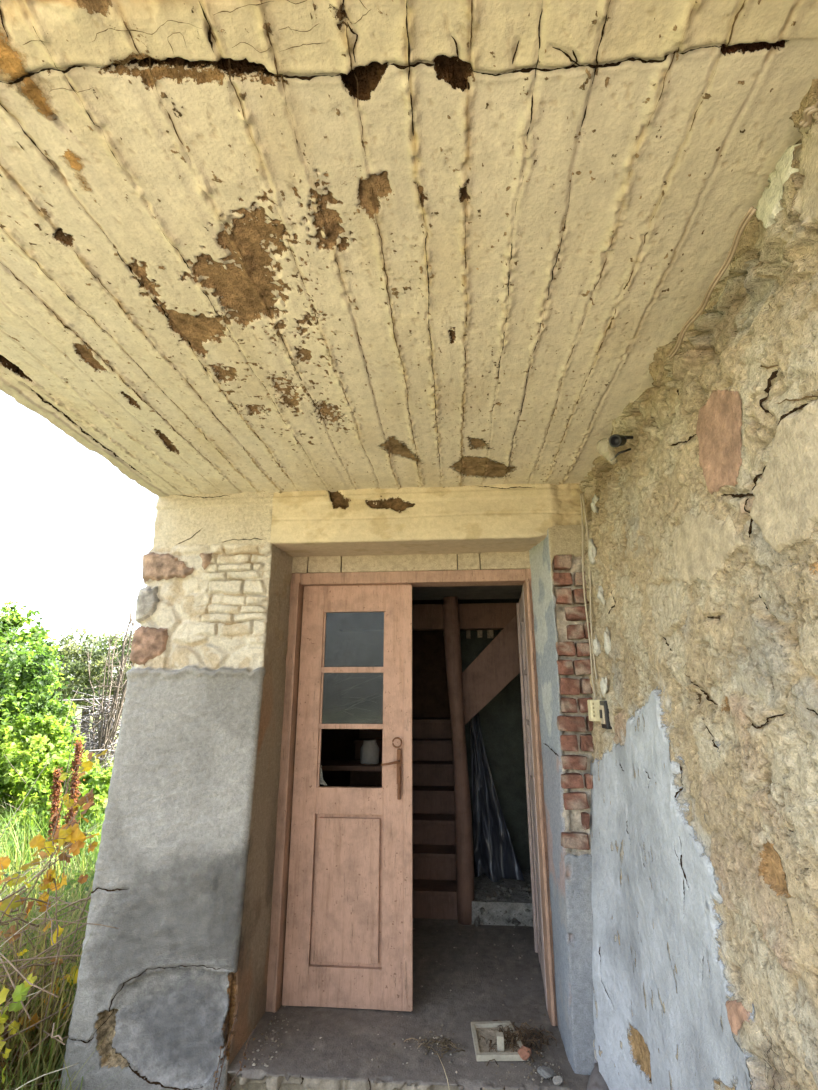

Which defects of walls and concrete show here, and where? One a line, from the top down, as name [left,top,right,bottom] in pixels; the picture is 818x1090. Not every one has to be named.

crack [0,0,789,171]
peeling [440,147,484,203]
crack [0,201,279,498]
peeling [60,323,288,494]
peeling [106,143,394,509]
crack [206,174,663,489]
peeling [365,312,610,513]
crack [759,365,818,426]
crack [721,465,767,538]
peeling [552,554,755,1090]
crack [69,965,230,1090]
spalling [94,970,237,1089]